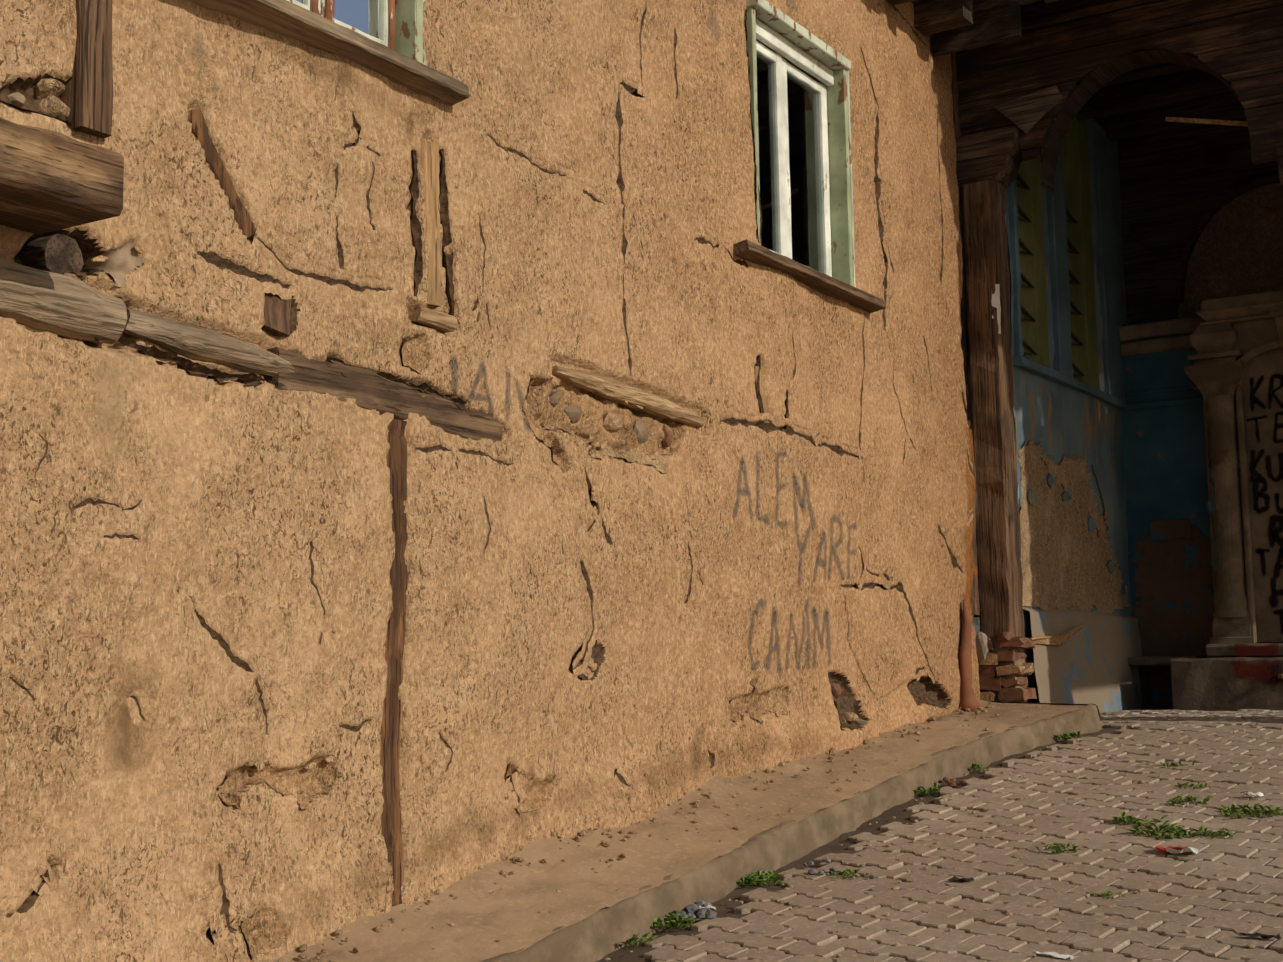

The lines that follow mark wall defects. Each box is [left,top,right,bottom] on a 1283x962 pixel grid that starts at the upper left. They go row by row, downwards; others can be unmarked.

spalling [0,74,72,123]
crack [196,108,496,334]
crack [485,0,683,375]
crack [93,336,266,386]
spalling [522,369,686,472]
crack [720,43,974,577]
crack [171,574,276,741]
spalling [216,755,342,809]
crack [572,464,616,681]
spalling [828,672,871,730]
spalling [907,676,952,710]
peeling [1018,440,1219,709]